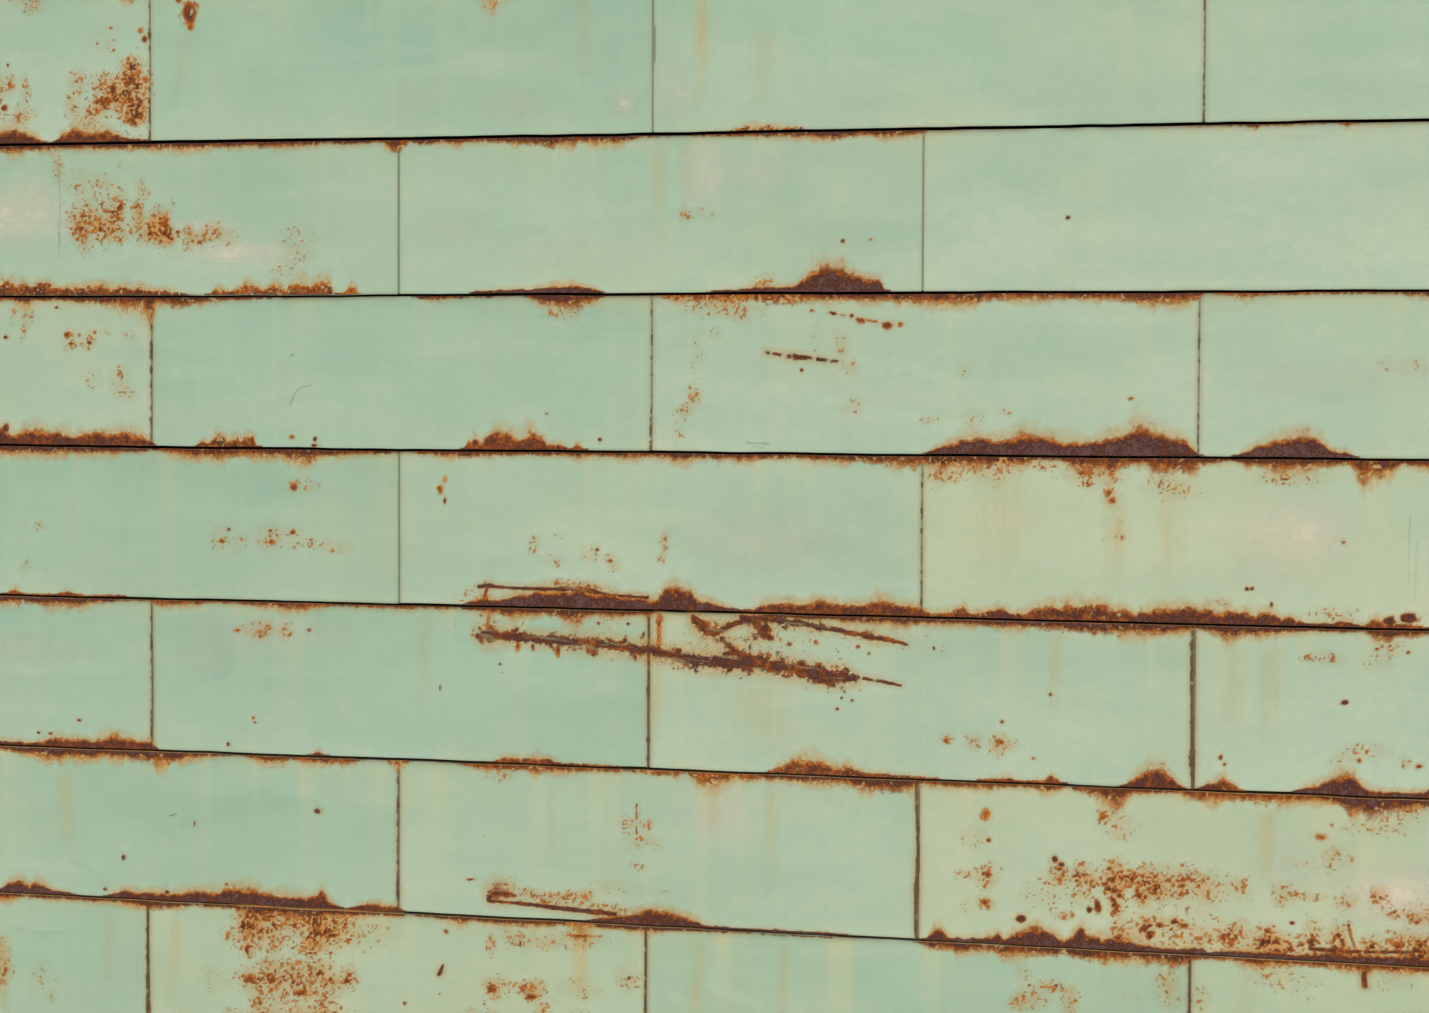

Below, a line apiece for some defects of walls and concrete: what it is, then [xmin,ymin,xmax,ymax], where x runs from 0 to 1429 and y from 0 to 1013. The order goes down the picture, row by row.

corrosion [0,27,668,176]
corrosion [651,265,1429,329]
corrosion [0,407,1429,503]